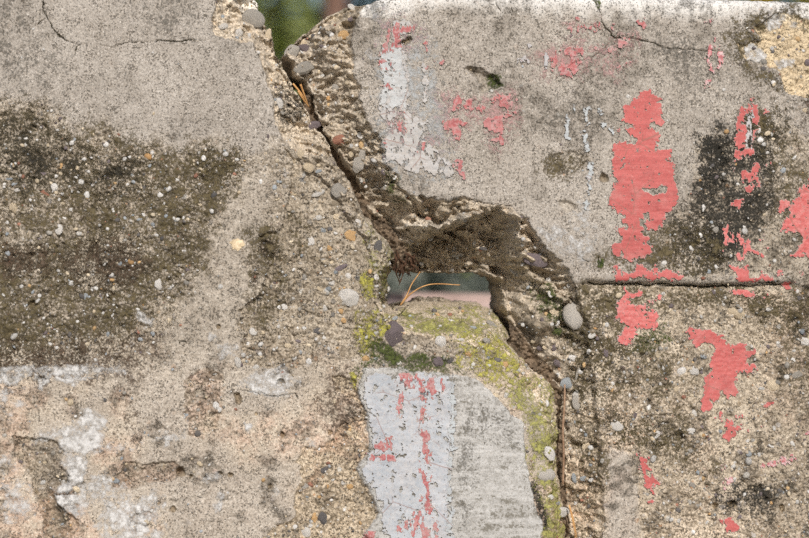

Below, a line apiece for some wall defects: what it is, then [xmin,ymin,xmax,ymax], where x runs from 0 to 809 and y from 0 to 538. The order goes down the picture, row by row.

crack [38,0,79,51]
crack [102,39,206,48]
crack [576,1,718,63]
leakage [723,3,809,93]
spalling [737,12,809,98]
crack [303,94,416,273]
leakage [0,94,248,401]
spalling [211,0,609,538]
leakage [536,96,809,537]
crack [587,280,790,288]
crack [507,321,573,538]
leakage [531,481,550,530]